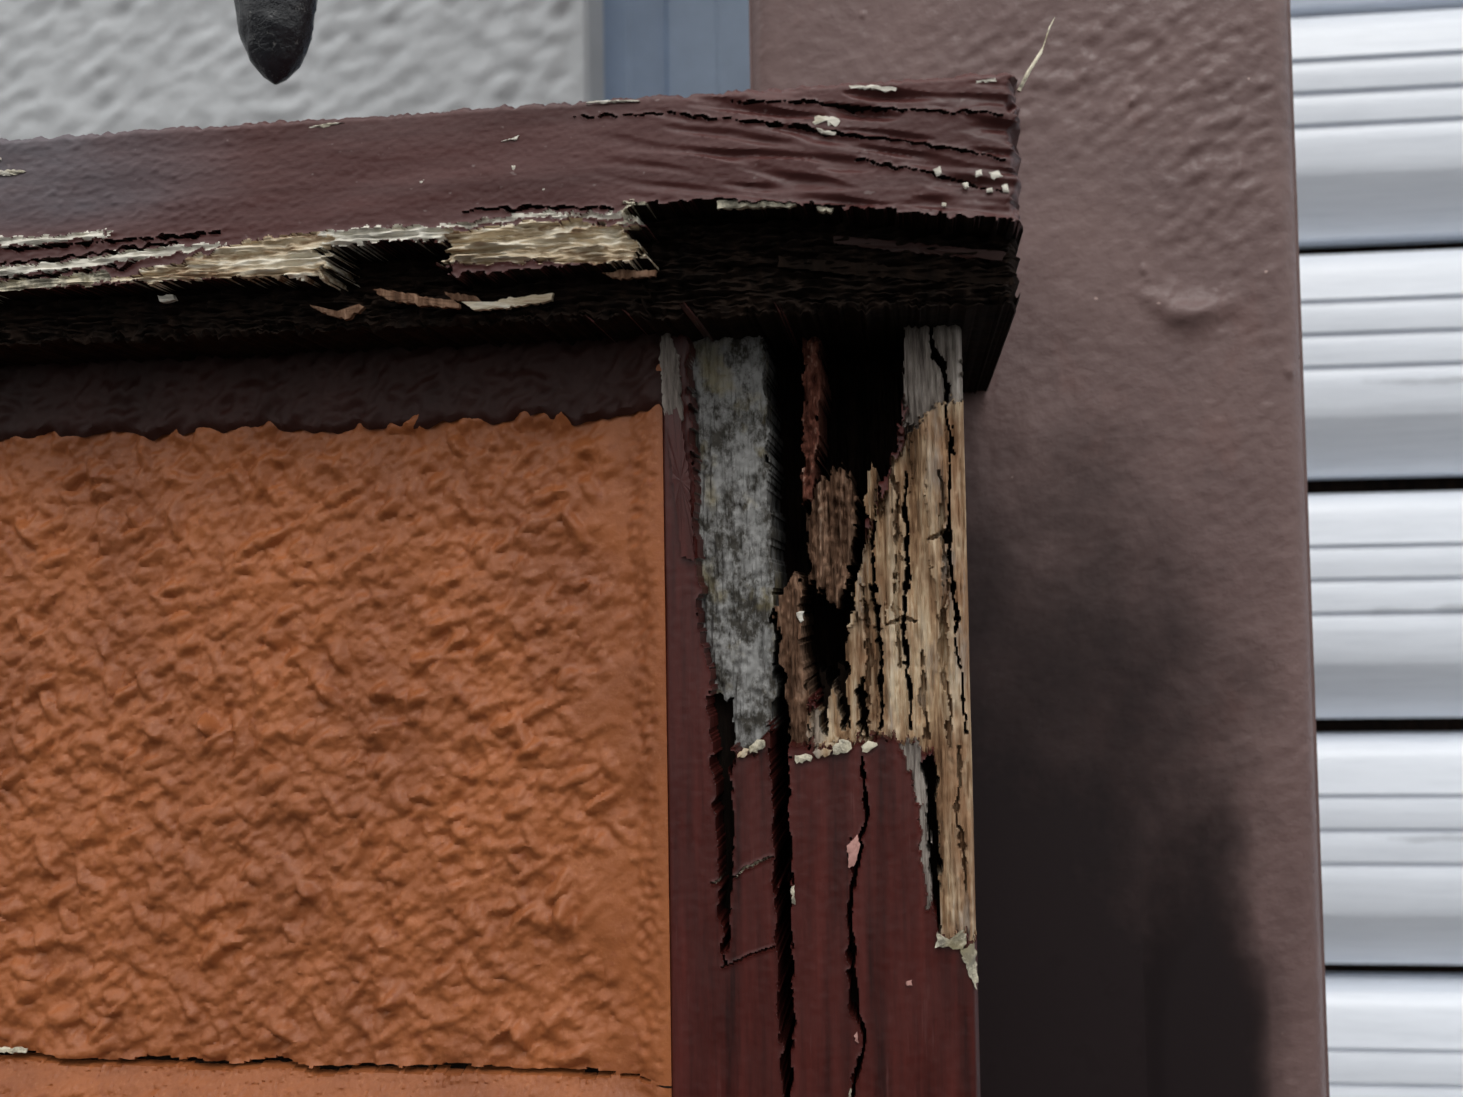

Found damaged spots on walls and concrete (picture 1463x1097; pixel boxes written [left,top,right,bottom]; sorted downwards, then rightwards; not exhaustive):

peeling [812,115,840,136]
peeling [962,169,1009,193]
spalling [0,197,1023,763]
crack [708,338,813,1094]
peeling [935,929,978,989]